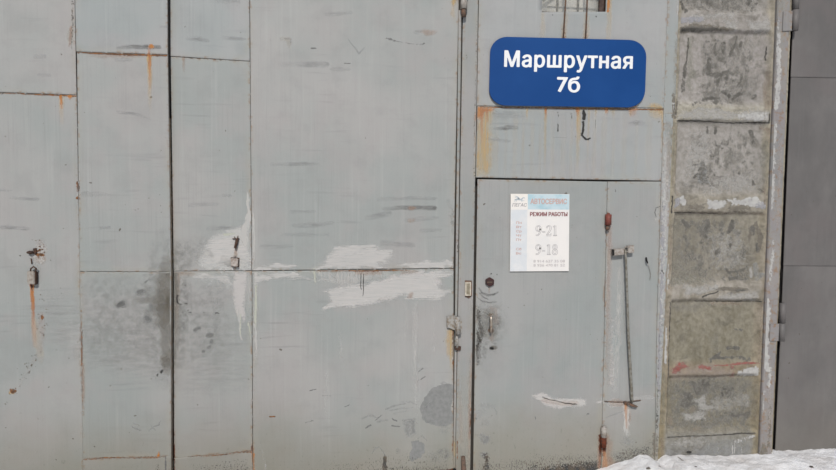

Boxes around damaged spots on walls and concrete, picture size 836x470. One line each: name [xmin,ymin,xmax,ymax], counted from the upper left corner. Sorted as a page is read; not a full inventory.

rust [77,44,171,73]
rust [477,105,664,170]
rust [598,434,618,469]